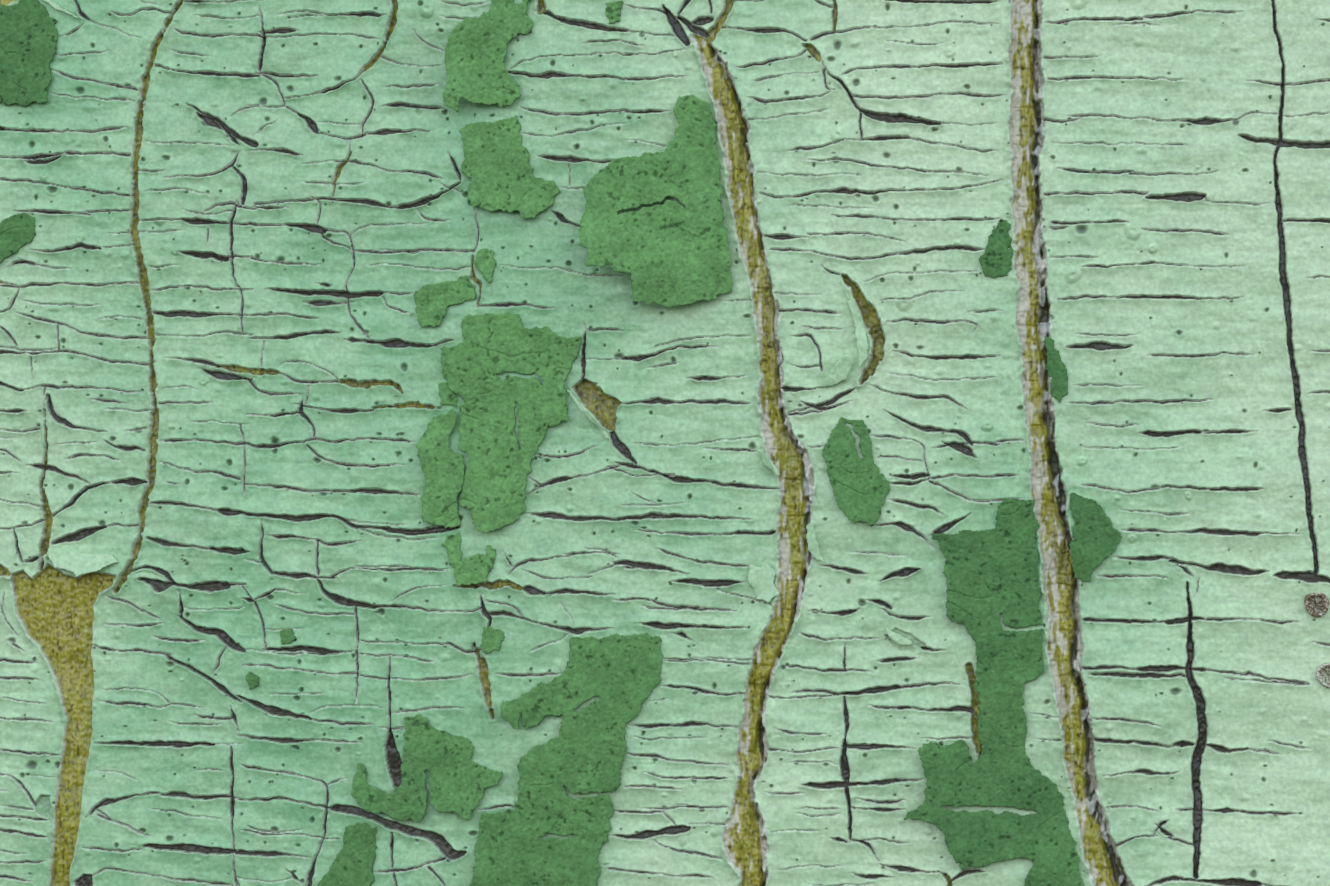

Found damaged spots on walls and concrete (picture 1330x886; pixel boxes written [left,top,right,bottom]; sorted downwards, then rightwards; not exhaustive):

peeling [0,0,78,106]
peeling [443,0,561,219]
peeling [578,94,733,308]
peeling [979,219,1013,278]
crack [0,0,1026,886]
peeling [413,248,622,586]
peeling [822,417,890,527]
peeling [1069,493,1122,582]
crack [1027,0,1330,886]
peeling [0,551,119,886]
peeling [318,633,664,886]
peeling [904,498,1084,886]